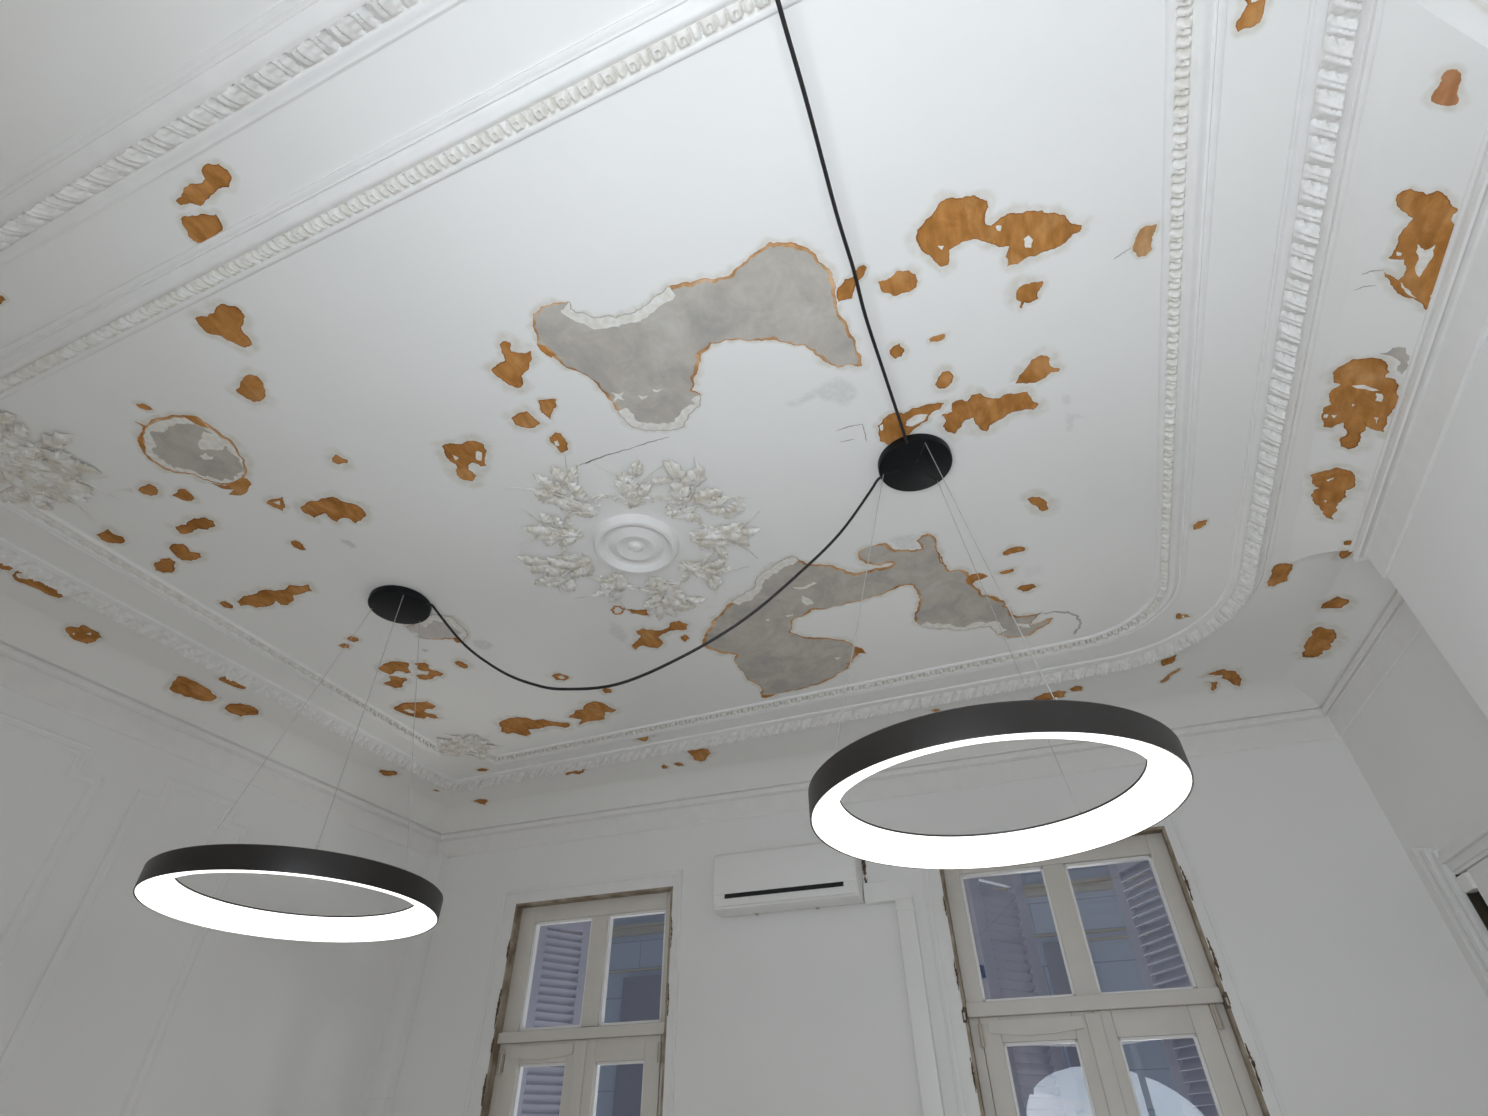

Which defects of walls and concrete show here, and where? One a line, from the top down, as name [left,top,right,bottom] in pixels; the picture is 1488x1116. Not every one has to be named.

peeling [1226,0,1278,43]
peeling [1371,182,1464,315]
flaking render [425,183,1096,492]
flaking render [113,397,378,576]
peeling [1298,347,1410,563]
peeling [0,563,110,648]
peeling [212,579,322,612]
flaking render [610,529,1086,700]